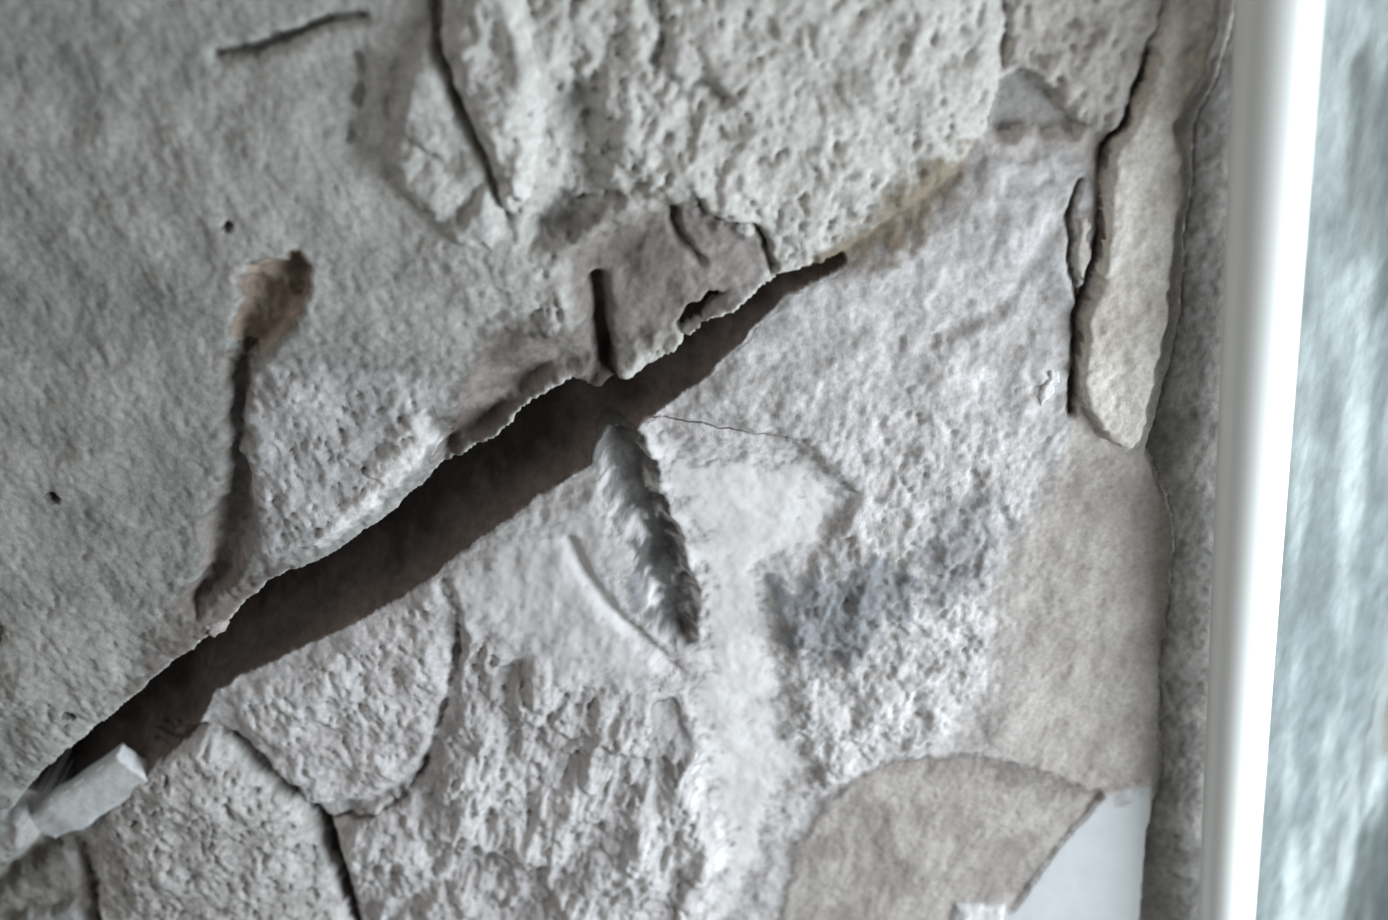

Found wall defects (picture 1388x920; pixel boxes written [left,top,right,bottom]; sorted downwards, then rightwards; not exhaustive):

crack [231,11,366,56]
crack [348,52,364,144]
crack [431,0,498,196]
crack [1064,52,1147,413]
crack [28,201,844,920]
spalling [182,203,780,601]
spalling [591,409,701,653]
spalling [688,0,1235,920]
spalling [31,743,149,839]
spalling [339,604,720,920]